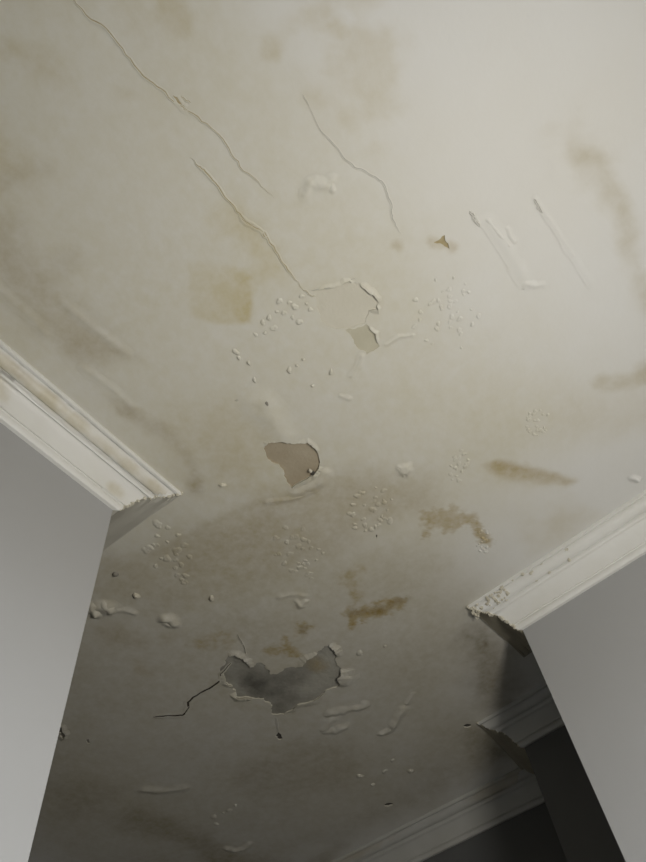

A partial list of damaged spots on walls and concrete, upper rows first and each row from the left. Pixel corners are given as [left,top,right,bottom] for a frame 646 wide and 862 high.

crack [72,0,274,198]
crack [189,157,356,297]
leakage [0,0,646,626]
crack [303,95,401,234]
peeling [421,232,463,259]
flaking render [262,438,336,507]
crack [153,634,249,719]
leakage [28,526,546,862]
flaking render [218,642,360,740]